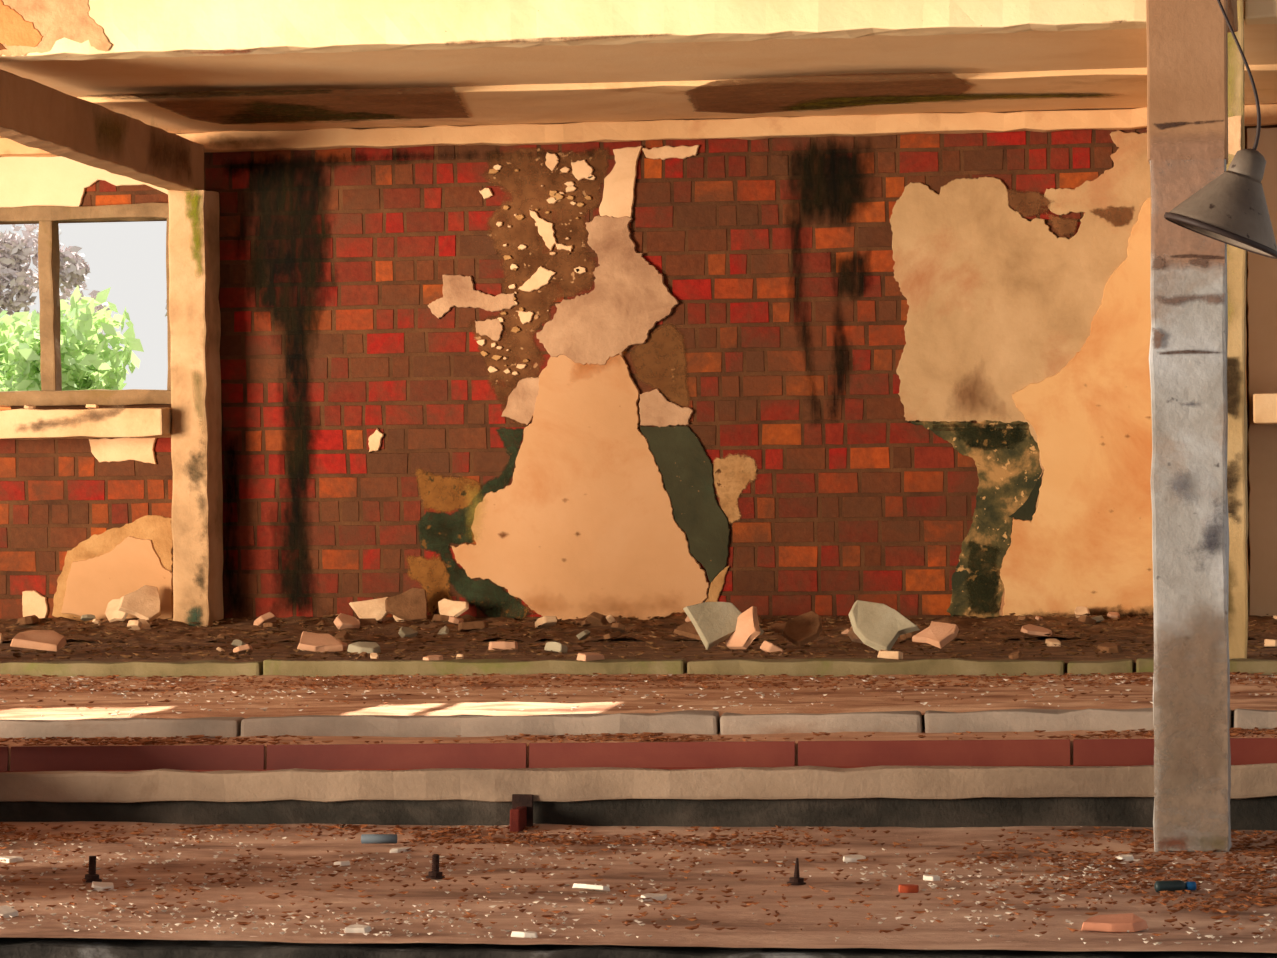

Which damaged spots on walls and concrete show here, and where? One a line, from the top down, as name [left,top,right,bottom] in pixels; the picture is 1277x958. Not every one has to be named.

spalling [0,0,112,57]
water stain [790,143,868,368]
flaking render [22,515,201,626]
water stain [222,436,242,611]
water stain [226,156,366,613]
flaking render [368,428,384,453]
flaking render [406,145,757,620]
water stain [811,310,848,417]
flaking render [890,130,1154,619]